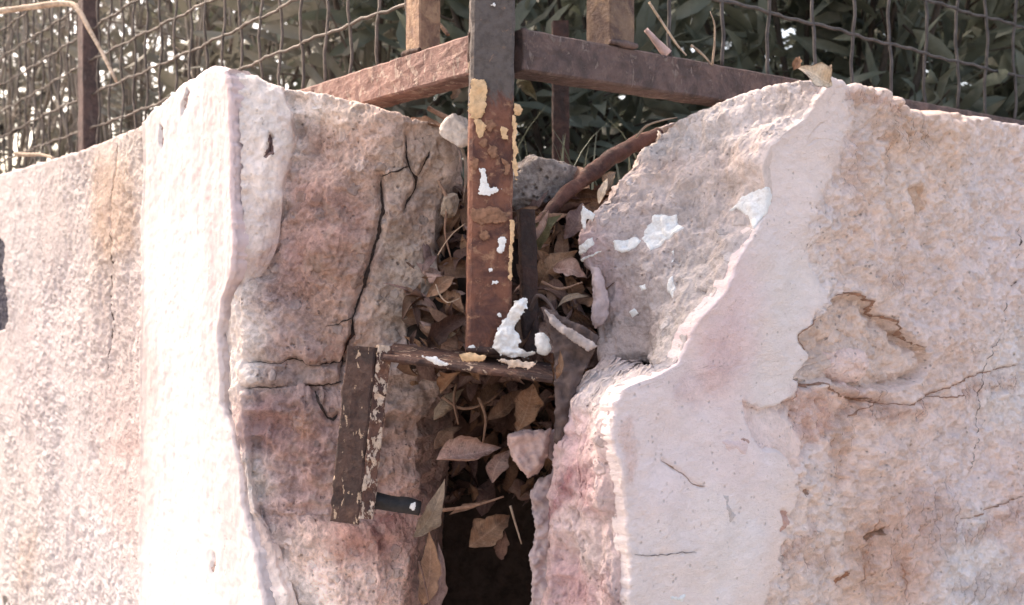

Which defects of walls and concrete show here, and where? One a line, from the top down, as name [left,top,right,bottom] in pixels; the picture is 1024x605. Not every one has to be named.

crack [248,140,430,421]
spalling [541,80,849,605]
flaking render [722,294,928,471]
crack [847,231,1023,469]